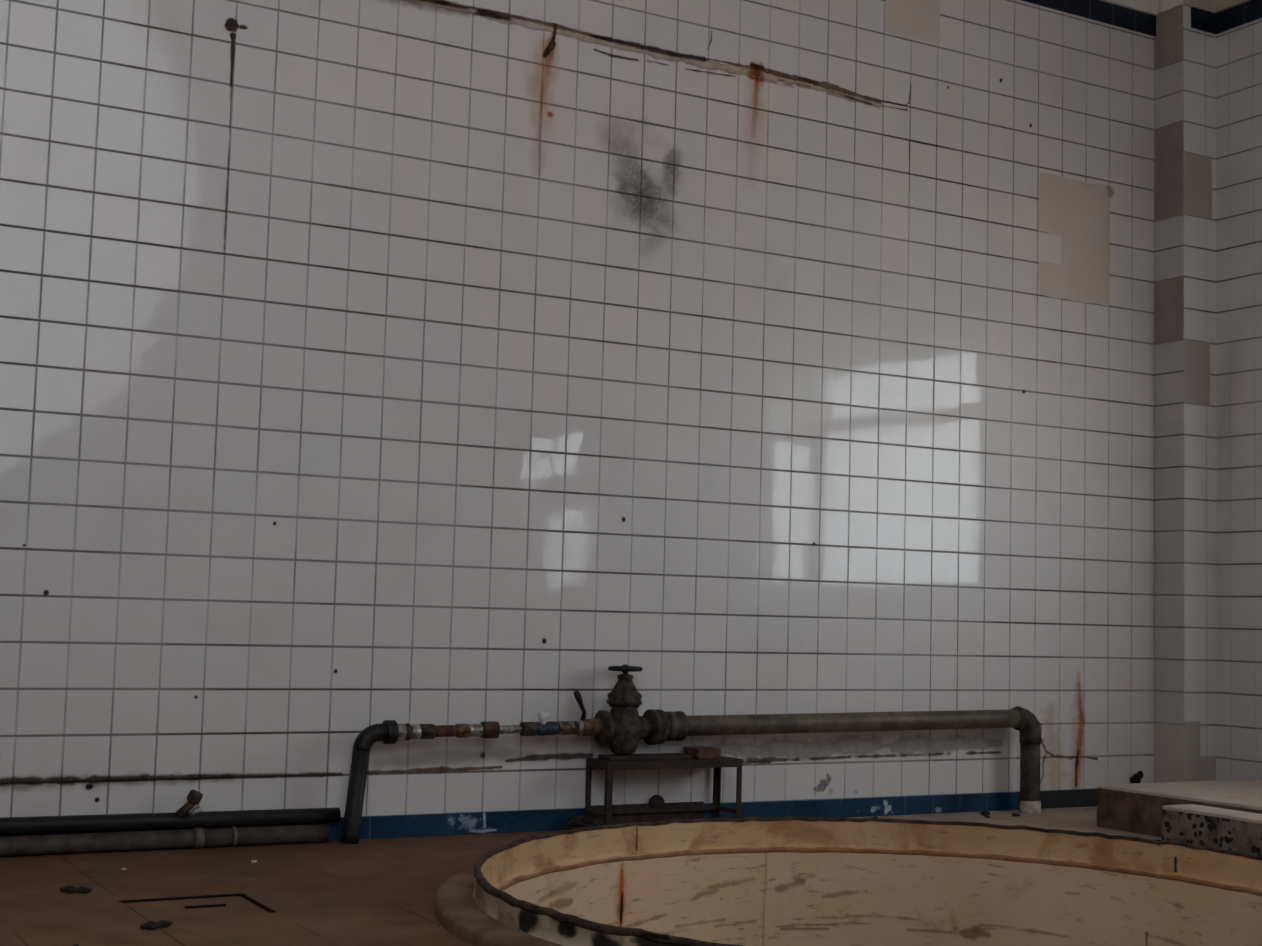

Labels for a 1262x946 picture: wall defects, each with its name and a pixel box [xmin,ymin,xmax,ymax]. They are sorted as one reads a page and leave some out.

crack [225,18,247,118]
crack [406,0,911,111]
crack [222,155,230,250]
water stain [0,772,342,785]
corrosion [1075,704,1084,786]
crack [619,827,638,927]